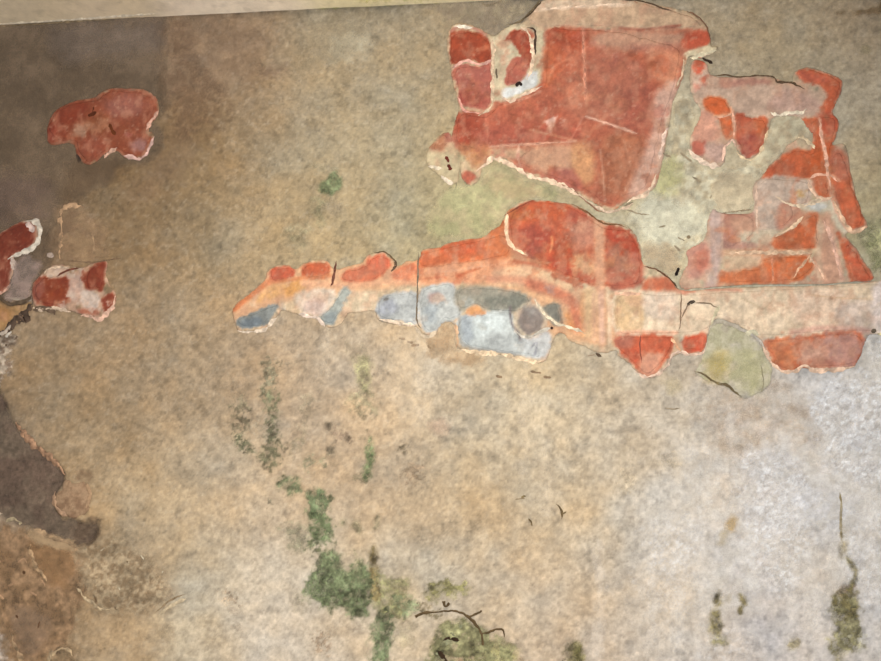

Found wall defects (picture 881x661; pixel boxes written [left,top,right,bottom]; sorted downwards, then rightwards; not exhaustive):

damp [0,17,168,302]
peeling [47,202,121,264]
peeling [7,256,38,301]